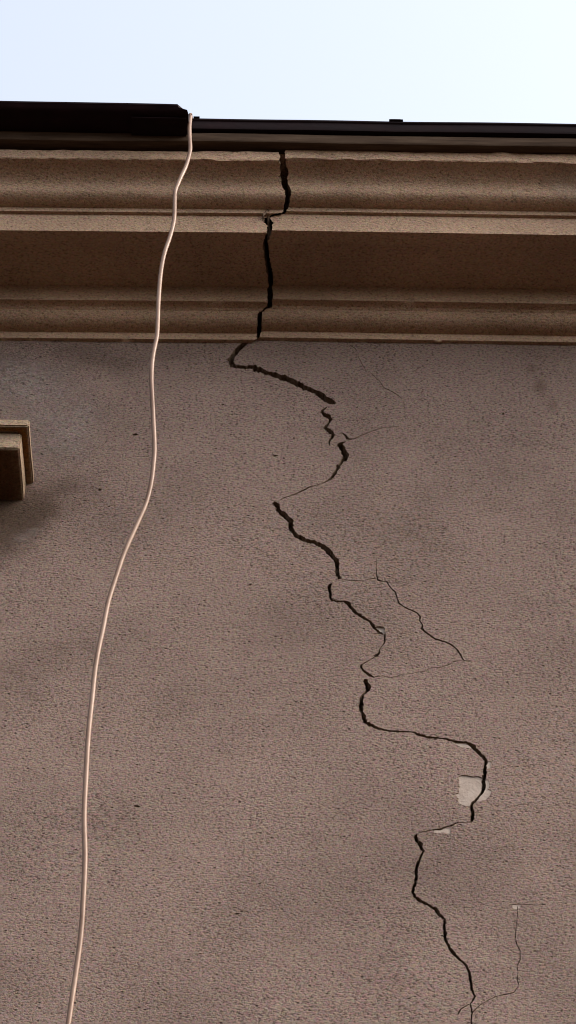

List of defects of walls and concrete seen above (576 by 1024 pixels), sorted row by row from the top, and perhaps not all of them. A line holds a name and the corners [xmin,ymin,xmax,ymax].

crack [227,158,546,1024]
peeling [456,761,492,806]